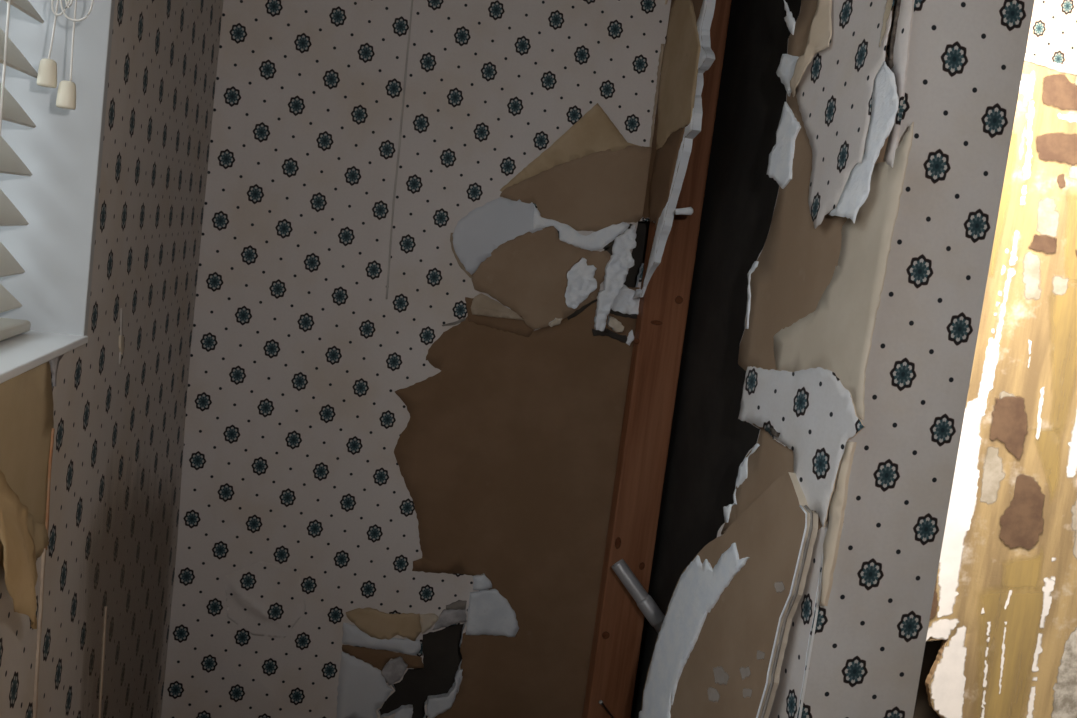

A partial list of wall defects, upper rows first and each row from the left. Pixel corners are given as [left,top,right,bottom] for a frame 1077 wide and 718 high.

water stain [1042,74,1077,111]
water stain [977,133,1077,718]
spalling [336,600,467,718]
water stain [929,579,938,621]